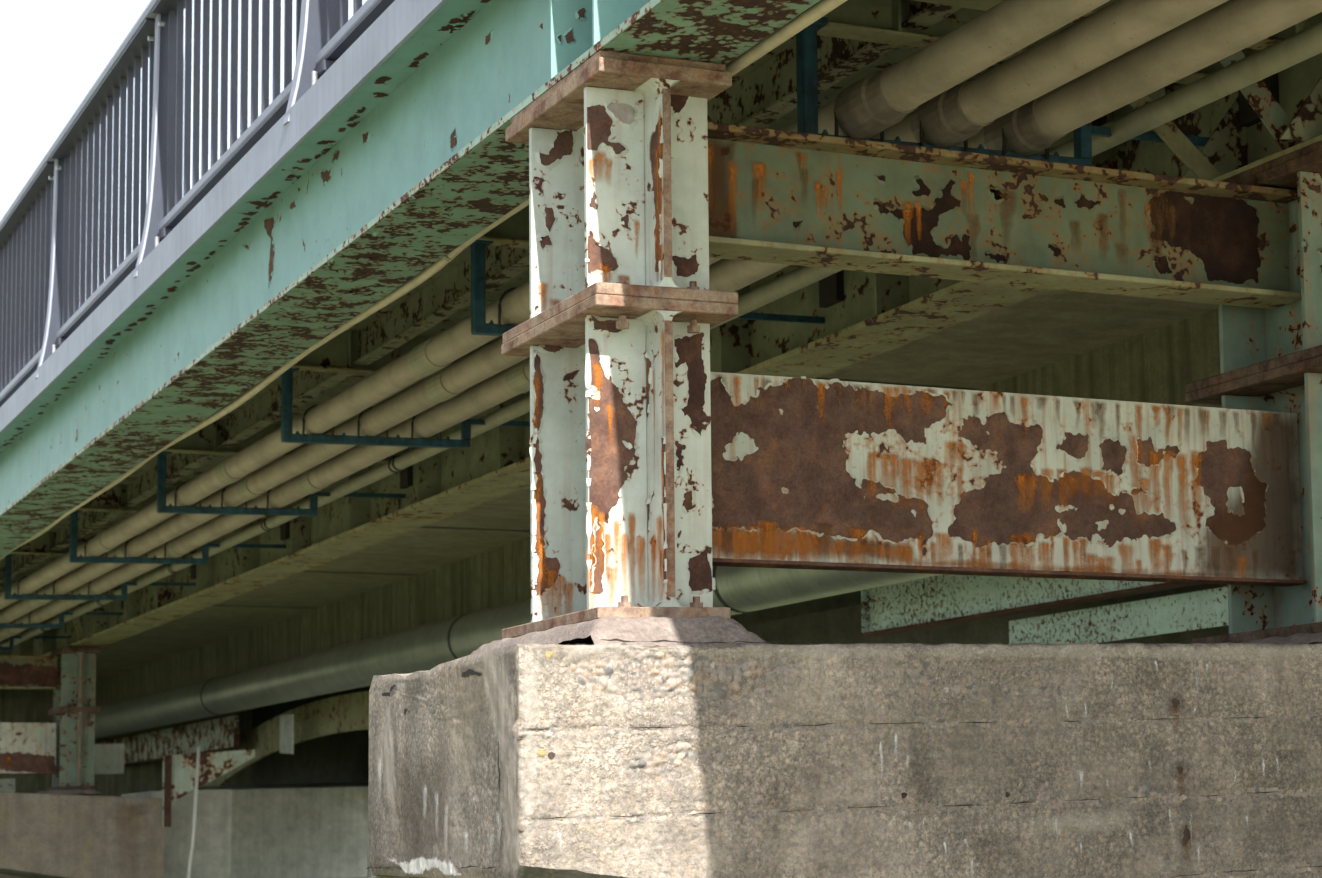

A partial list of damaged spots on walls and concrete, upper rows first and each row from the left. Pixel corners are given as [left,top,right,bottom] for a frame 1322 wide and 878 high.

peeling [408,0,491,67]
peeling [604,99,638,129]
peeling [0,76,392,448]
corrosion [540,284,560,306]
corrosion [873,173,1013,264]
corrosion [1046,243,1064,260]
corrosion [1054,191,1123,238]
corrosion [1146,190,1262,285]
corrosion [530,345,572,604]
corrosion [585,315,1299,595]
corrosion [0,662,60,687]
corrosion [0,752,57,773]